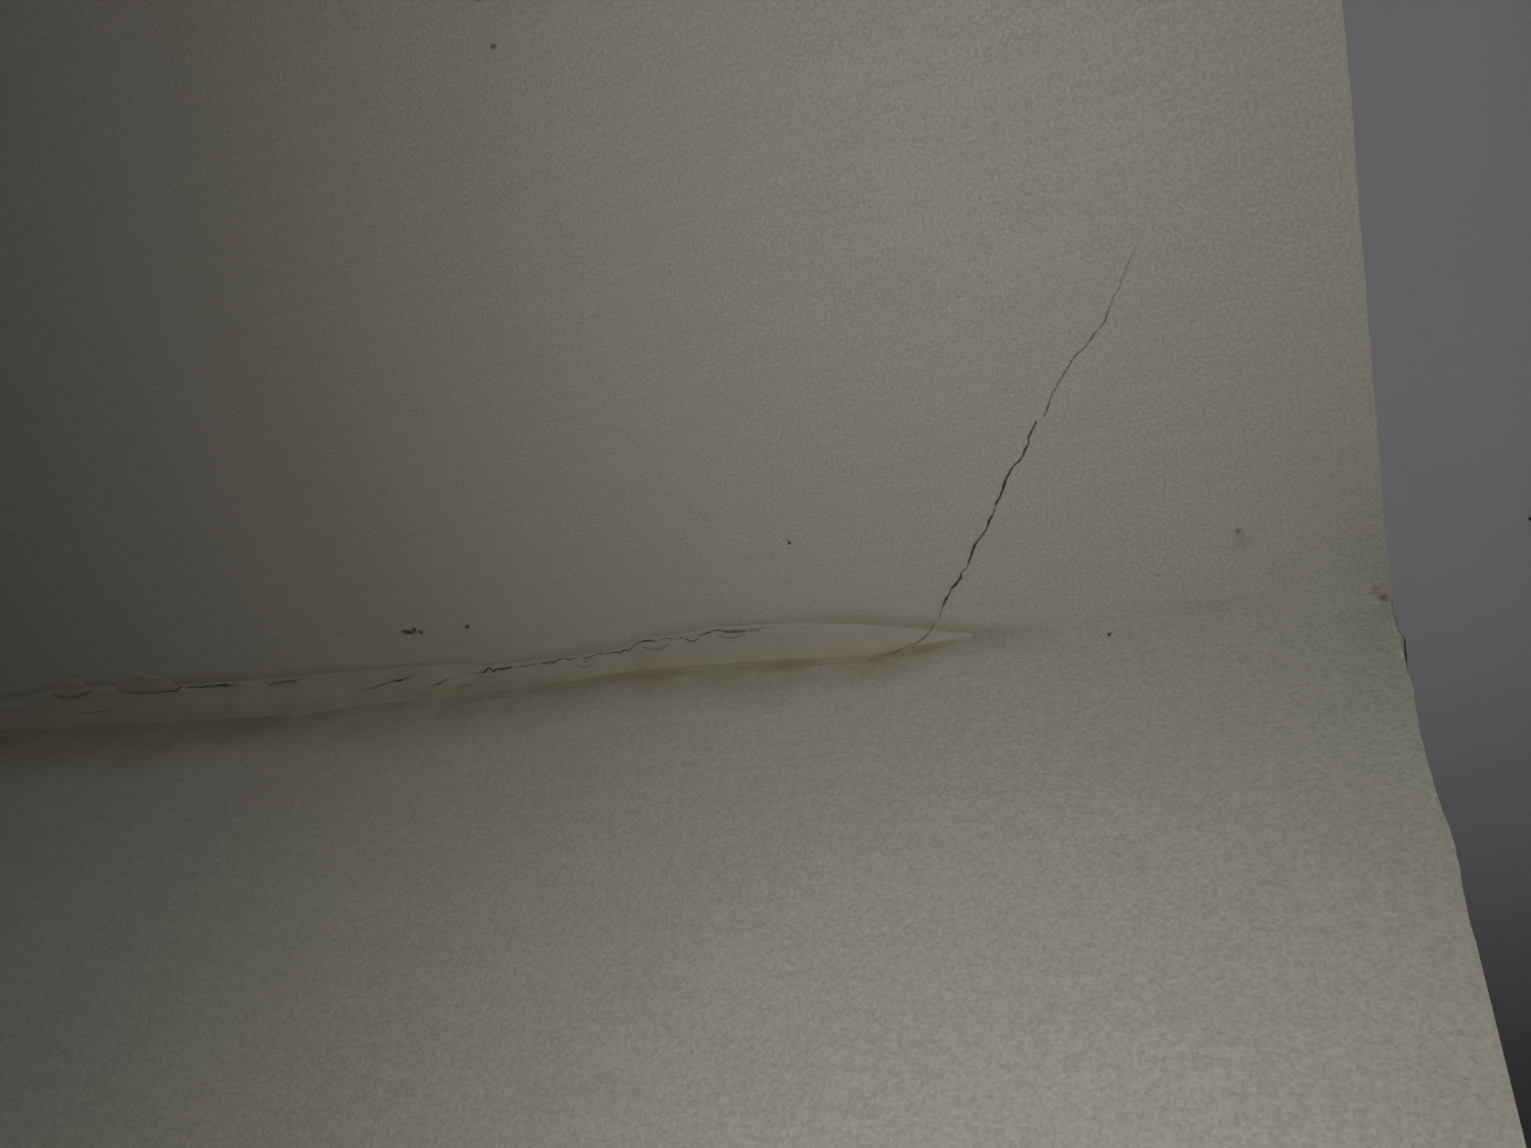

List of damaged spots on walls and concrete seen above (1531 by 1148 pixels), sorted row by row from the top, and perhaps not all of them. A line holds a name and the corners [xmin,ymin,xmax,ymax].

crack [893,338,1091,653]